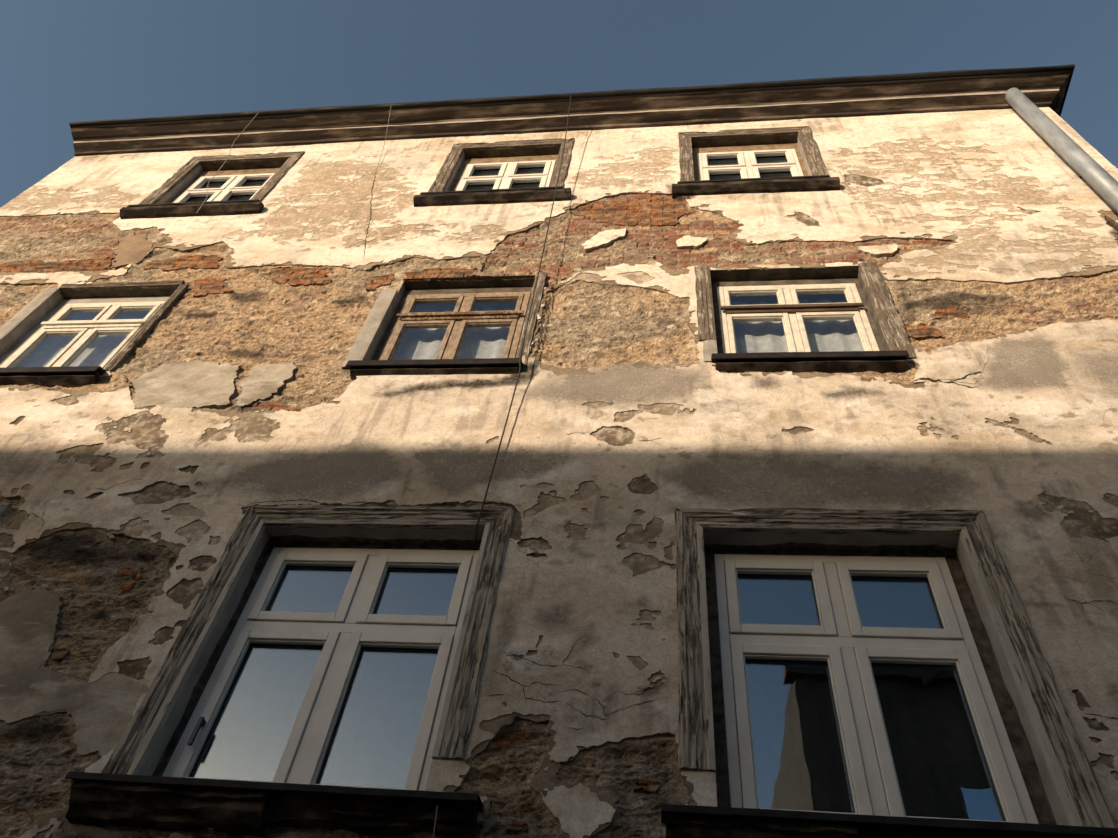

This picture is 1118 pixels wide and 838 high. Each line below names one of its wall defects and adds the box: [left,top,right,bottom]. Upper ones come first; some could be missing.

crack [363,169,377,258]
flaking render [0,136,1118,472]
damp [221,443,402,499]
damp [415,451,562,492]
damp [672,455,960,507]
peeling [1037,491,1118,542]
flaking render [0,466,221,682]
crack [488,635,664,730]
flaking render [0,709,444,838]
flaking render [443,702,697,838]